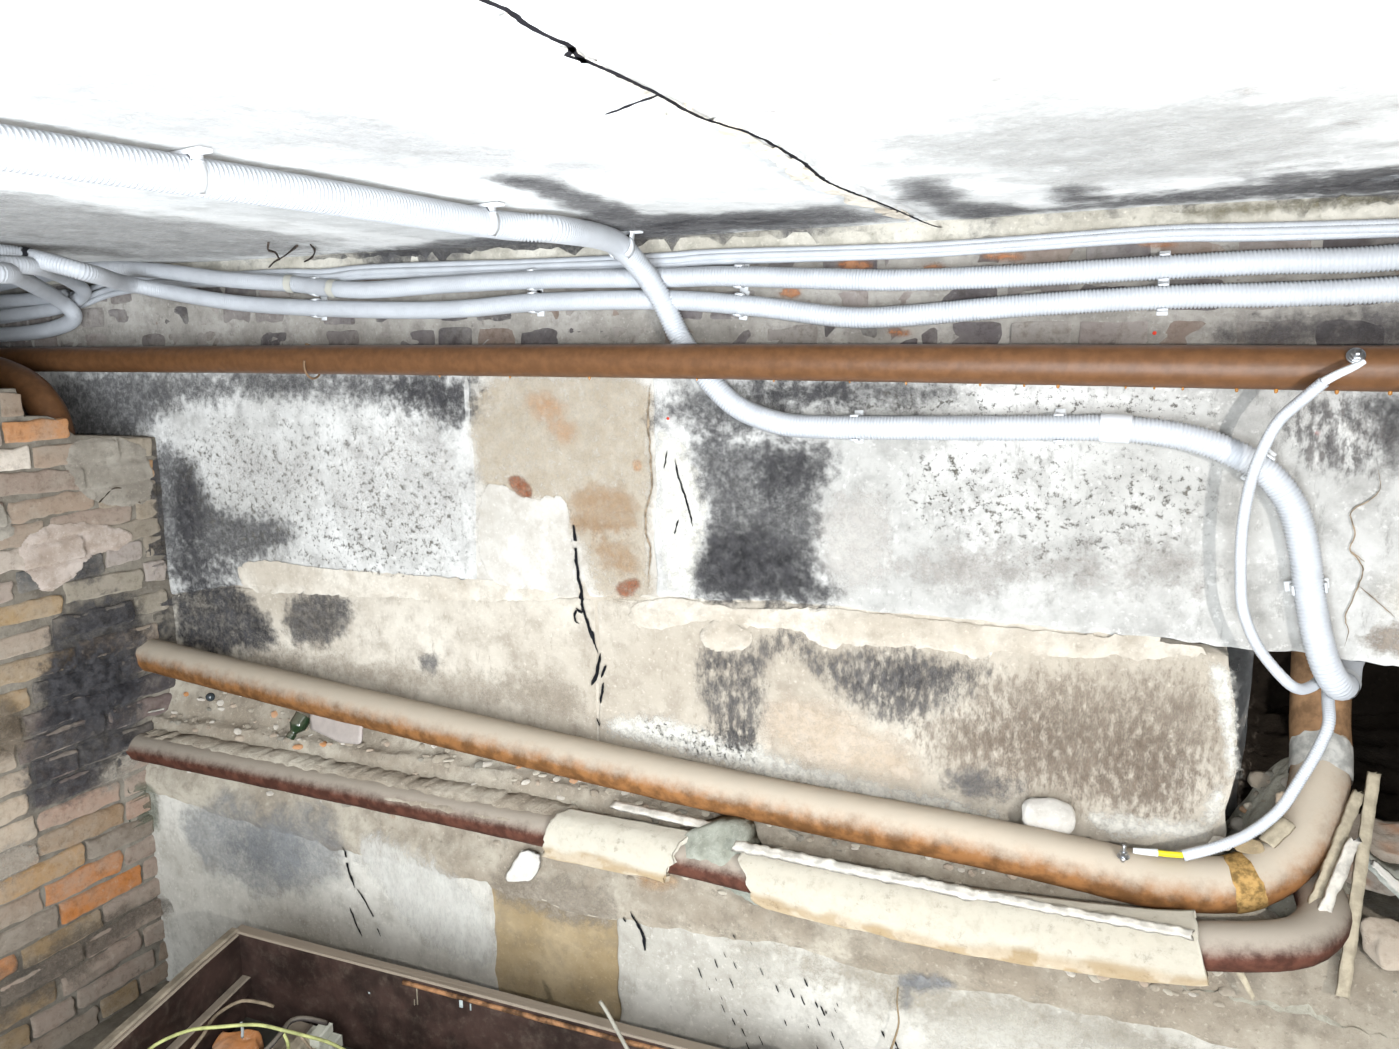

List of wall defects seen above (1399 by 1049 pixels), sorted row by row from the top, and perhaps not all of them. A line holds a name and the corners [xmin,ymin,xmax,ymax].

leakage [0,195,315,260]
crack [479,0,942,228]
leakage [1195,194,1398,215]
leakage [728,380,953,412]
leakage [53,372,483,666]
leakage [657,392,830,607]
crack [572,525,606,726]
leakage [102,755,157,828]
leakage [608,633,1238,840]